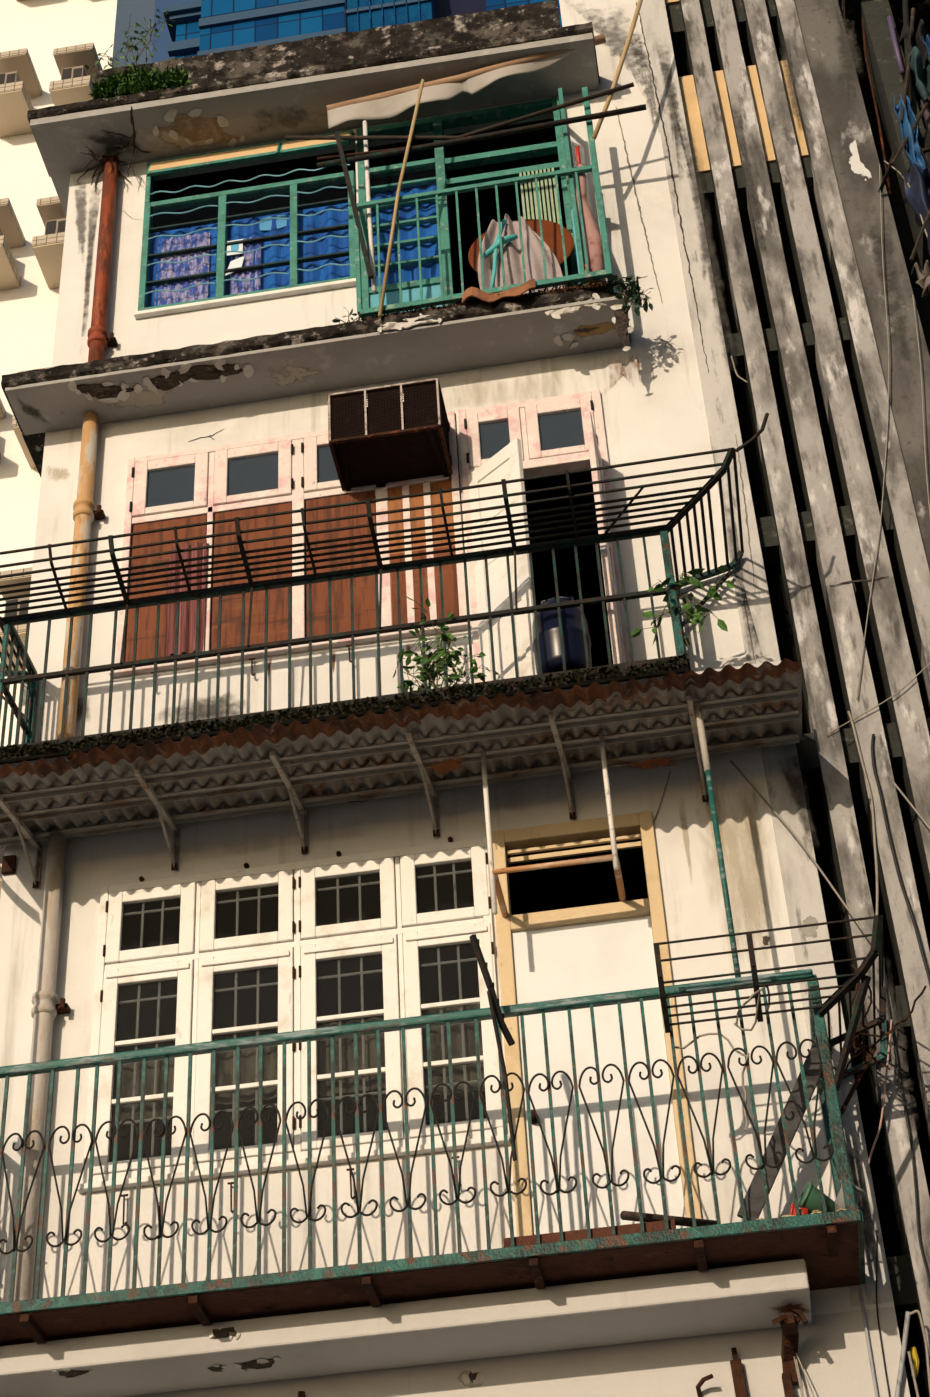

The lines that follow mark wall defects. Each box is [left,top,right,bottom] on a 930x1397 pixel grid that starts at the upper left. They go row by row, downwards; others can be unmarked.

spalling [152,108,245,151]
damp [588,16,730,337]
damp [76,186,98,331]
spalling [545,293,633,351]
spalling [67,359,254,408]
damp [175,697,238,721]